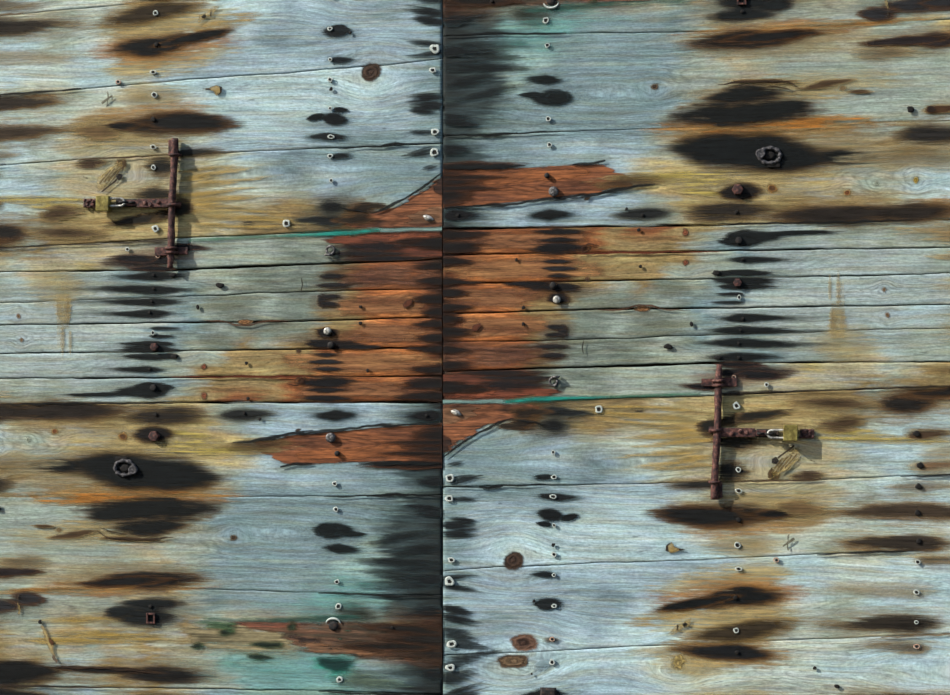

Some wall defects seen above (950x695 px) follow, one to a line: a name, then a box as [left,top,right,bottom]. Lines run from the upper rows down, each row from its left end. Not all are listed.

crack [338,131,560,149]
crack [573,159,605,167]
crack [340,164,526,214]
crack [444,184,655,208]
water stain [600,78,950,379]
water stain [0,255,286,542]
crack [232,423,440,443]
crack [358,418,544,466]
crack [280,461,312,469]
crack [324,483,543,498]